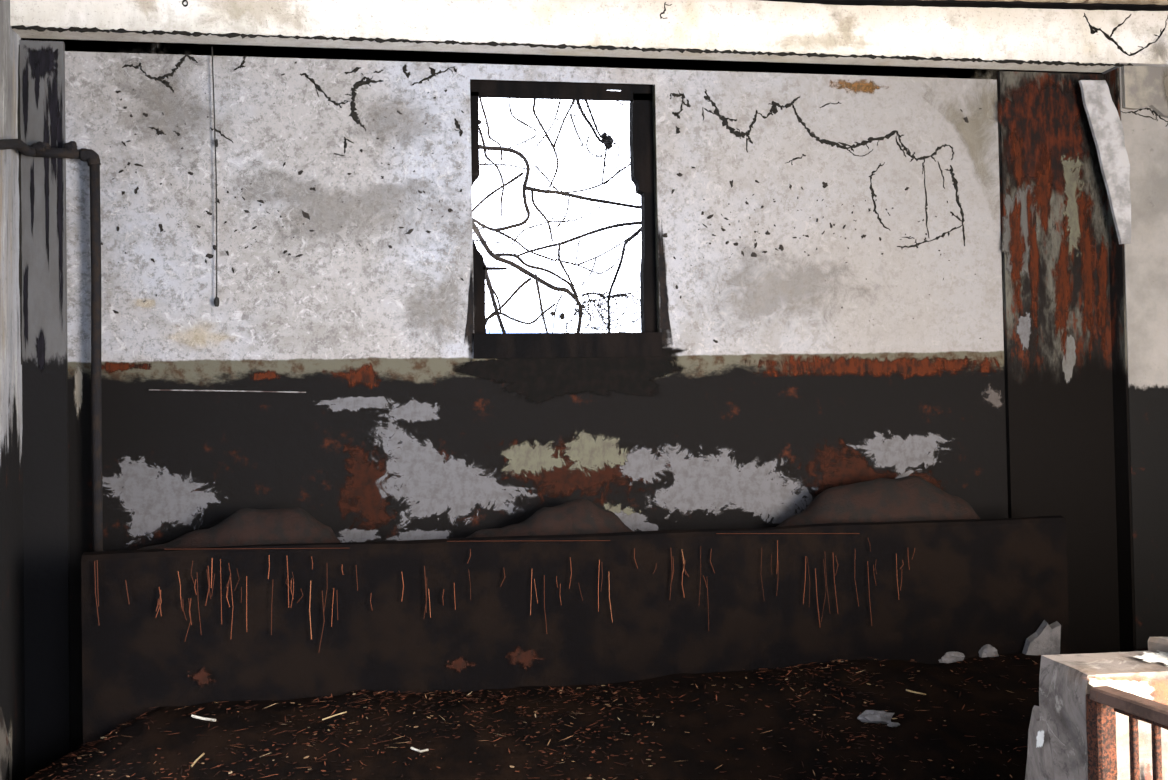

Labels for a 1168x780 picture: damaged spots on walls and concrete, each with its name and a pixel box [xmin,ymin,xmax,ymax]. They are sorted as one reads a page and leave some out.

crack [1083,13,1168,56]
crack [122,53,198,93]
crack [300,65,457,156]
crack [454,118,463,137]
crack [670,89,965,248]
peeling [316,396,818,543]
peeling [848,430,949,479]
peeling [102,456,228,545]
flaking render [1089,675,1154,700]
corrosion [1094,676,1168,705]